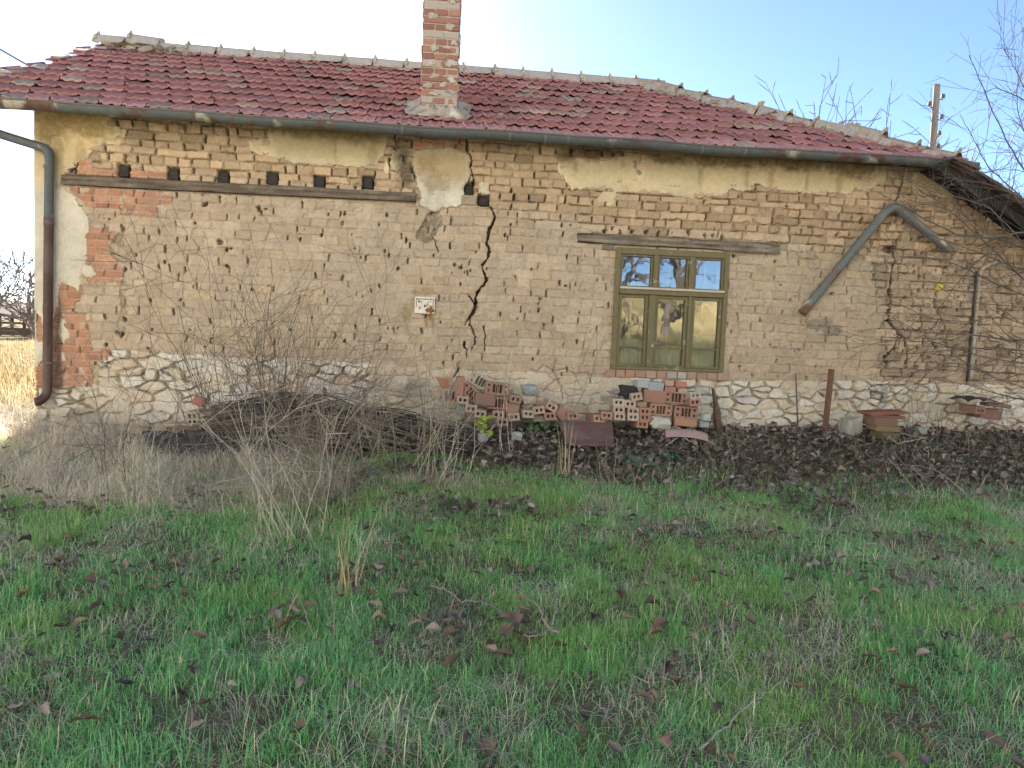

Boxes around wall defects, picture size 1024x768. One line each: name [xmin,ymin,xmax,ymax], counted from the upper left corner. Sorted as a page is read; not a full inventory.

peeling [34,111,123,372]
spalling [108,232,134,338]
peeling [248,127,490,243]
crack [466,139,476,187]
crack [453,206,496,378]
peeling [555,152,887,207]
crack [879,167,909,368]
peeling [911,172,953,199]